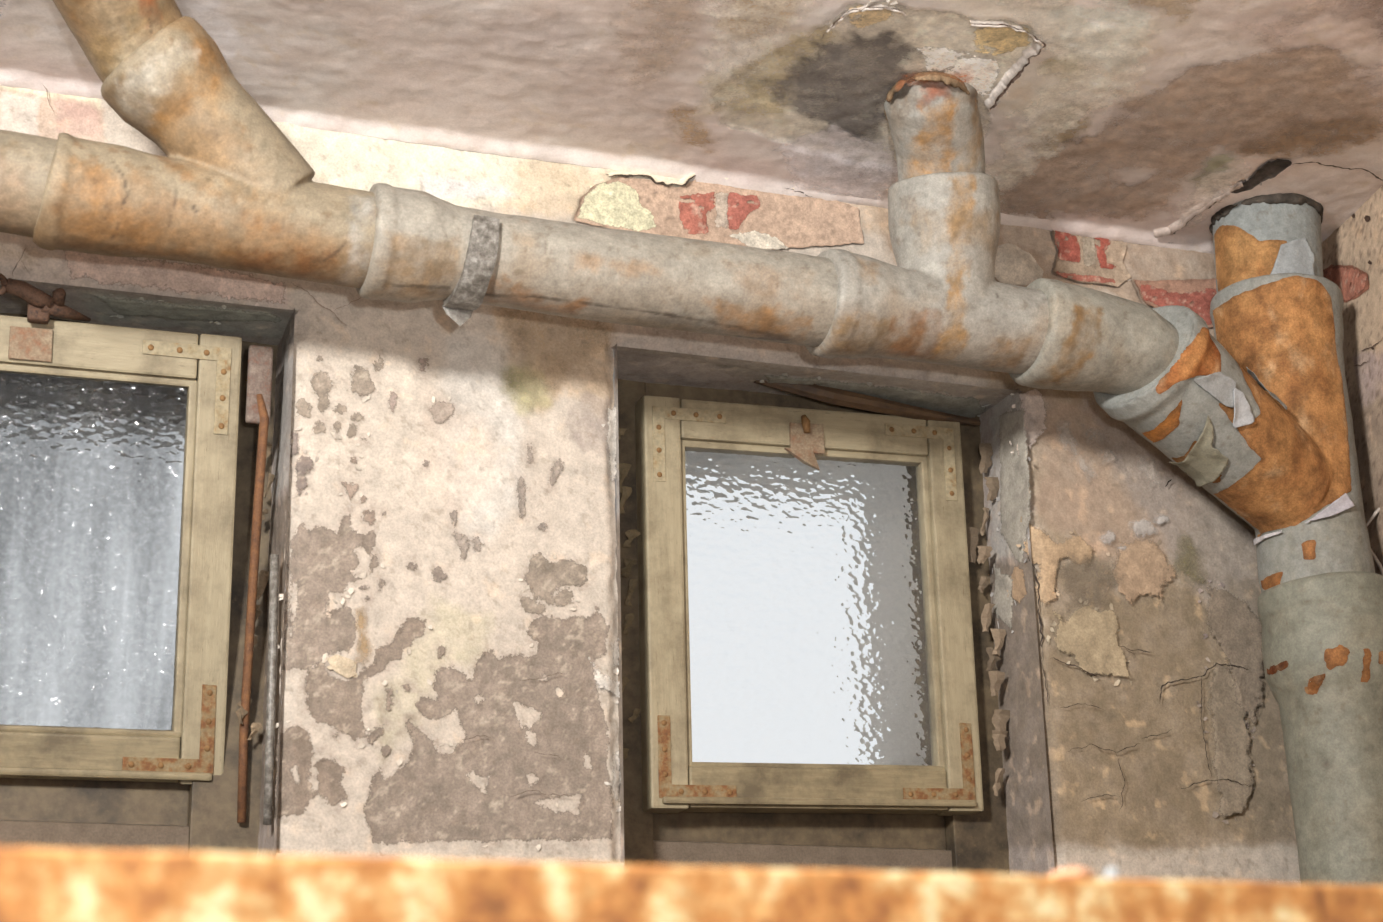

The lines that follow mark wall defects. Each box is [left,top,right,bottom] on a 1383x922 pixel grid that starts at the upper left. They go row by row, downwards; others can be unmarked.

flaking render [574,177,864,250]
leakage [704,0,915,199]
leakage [986,0,1383,223]
crack [1153,182,1244,238]
crack [1295,162,1383,181]
peeling [272,355,621,851]
peeling [760,373,1176,686]
crack [1027,555,1099,708]
crack [1068,663,1248,811]